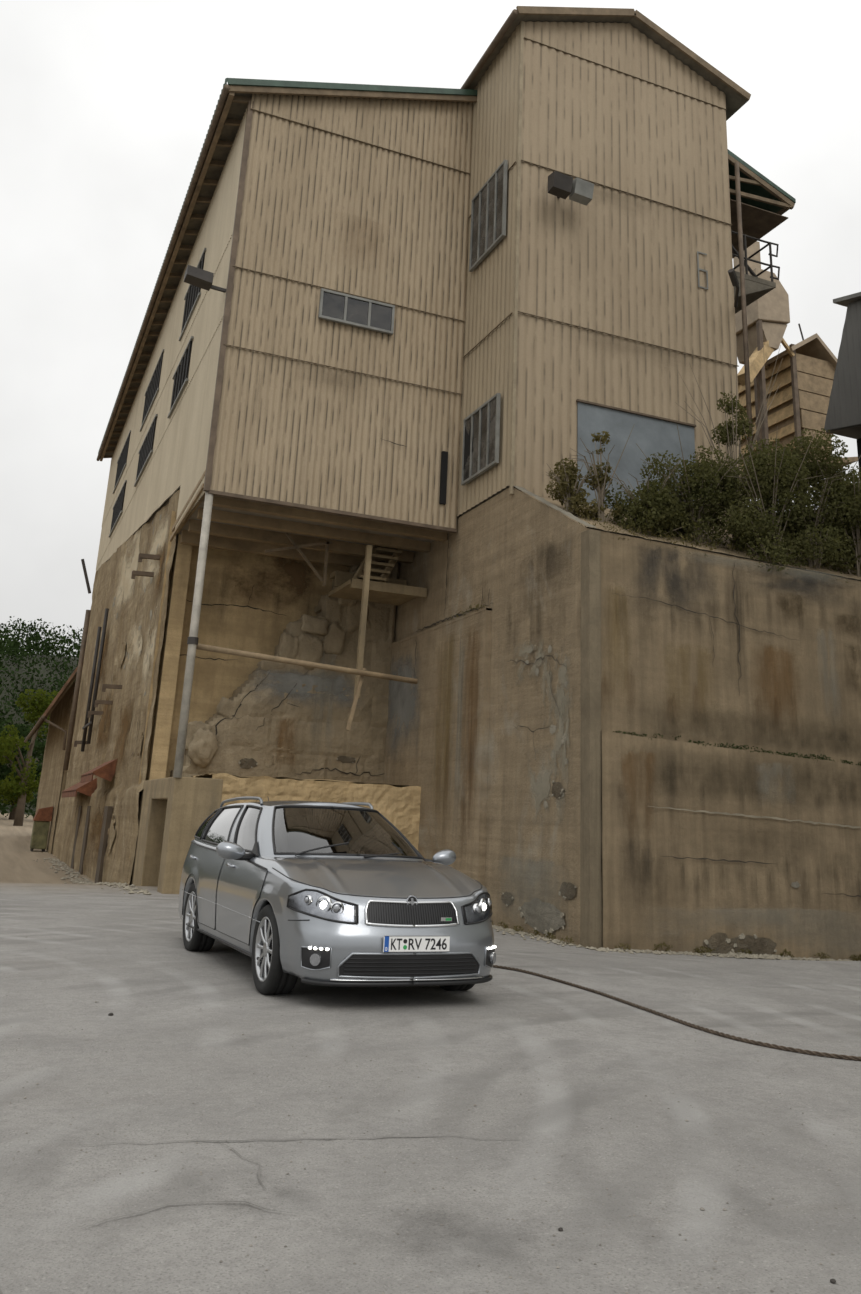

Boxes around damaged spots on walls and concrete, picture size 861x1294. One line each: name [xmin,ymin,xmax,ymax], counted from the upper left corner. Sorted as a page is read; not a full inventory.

crack [613,563,796,695]
crack [295,757,385,776]